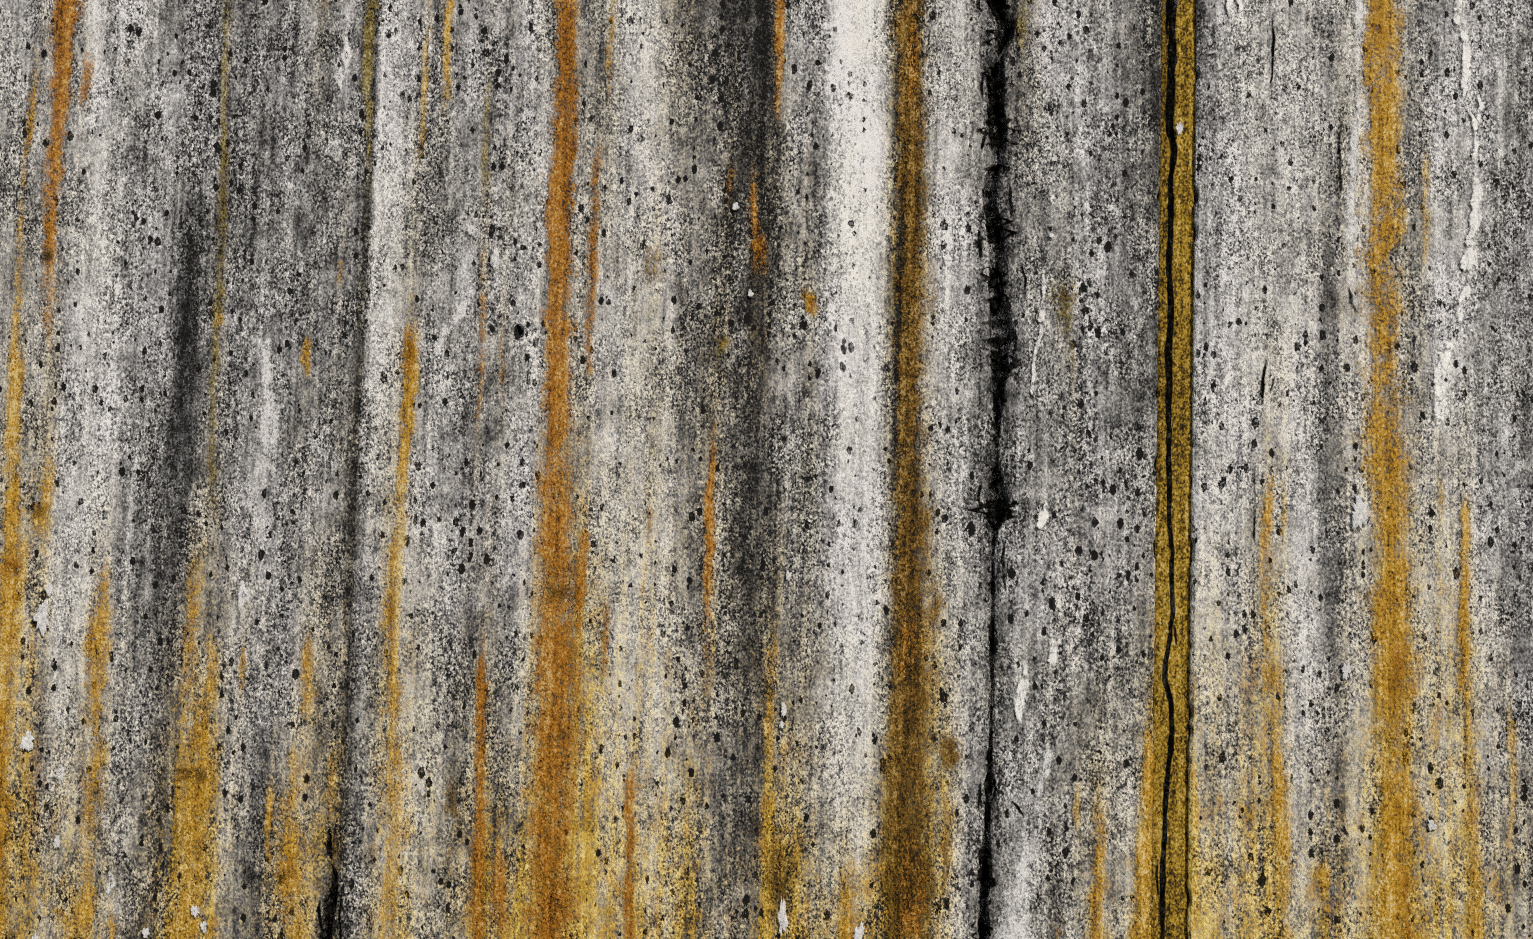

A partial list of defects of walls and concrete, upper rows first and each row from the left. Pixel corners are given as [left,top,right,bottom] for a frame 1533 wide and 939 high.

rust [0,0,115,939]
rust [167,557,219,939]
rust [264,747,311,939]
rust [469,0,602,939]
water stain [733,429,769,932]
water stain [726,3,781,303]
rust [879,0,961,939]
crack [961,0,1040,939]
rust [1127,728,1154,939]
crack [1155,0,1178,939]
rust [1258,475,1292,939]
rust [1355,0,1431,939]